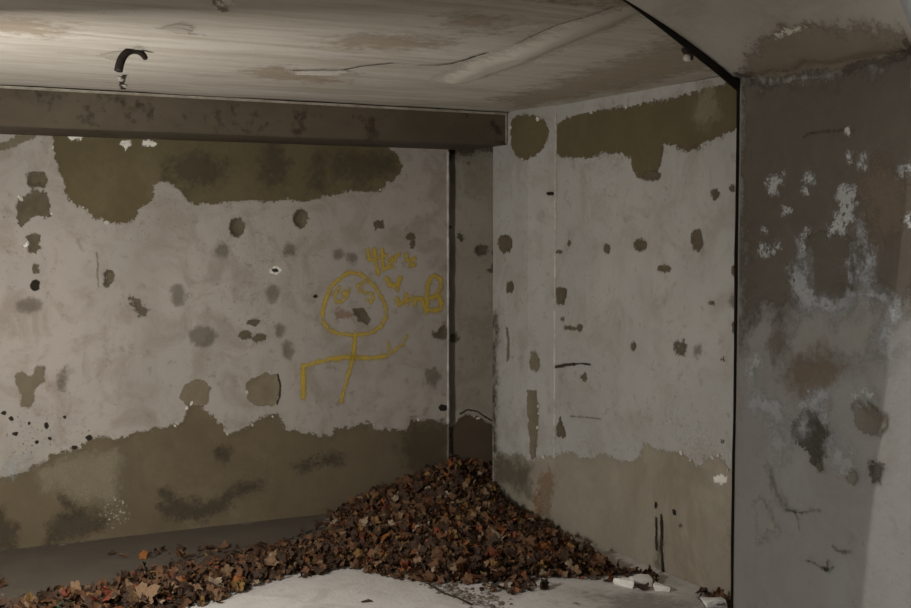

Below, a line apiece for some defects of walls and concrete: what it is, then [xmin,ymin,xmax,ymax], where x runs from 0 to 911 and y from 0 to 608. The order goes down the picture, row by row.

spalling [15,171,53,291]
peeling [51,136,403,229]
spalling [229,217,245,238]
peeling [509,19,911,344]
water stain [764,172,793,217]
water stain [800,173,816,196]
water stain [846,151,868,172]
spalling [103,270,115,288]
water stain [745,183,901,476]
water stain [0,448,329,601]
peeling [0,371,732,598]
spalling [790,408,831,473]